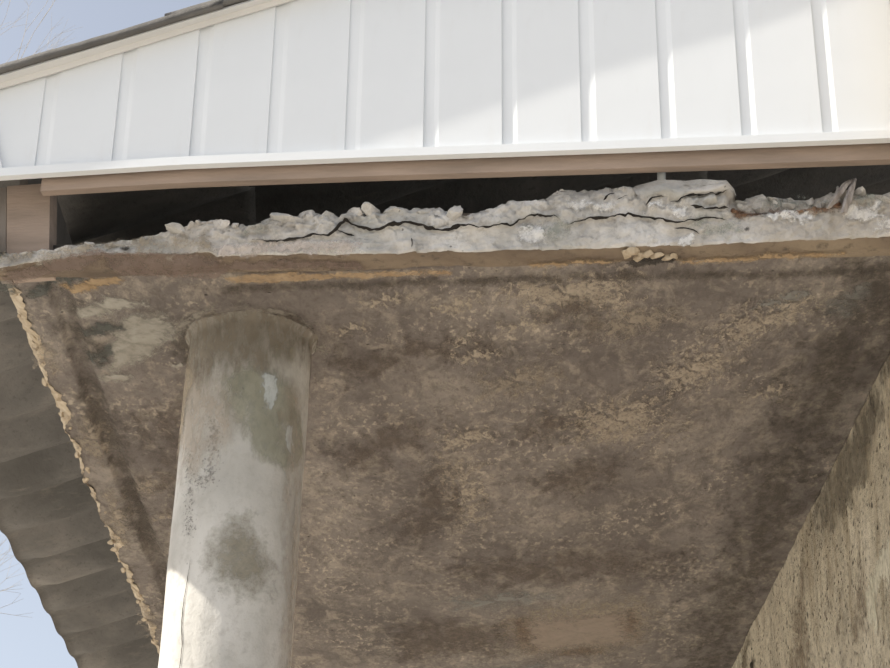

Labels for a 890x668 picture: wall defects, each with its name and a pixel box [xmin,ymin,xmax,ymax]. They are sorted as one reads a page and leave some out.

spalling [144,222,185,239]
spalling [261,202,401,224]
spalling [446,205,463,221]
crack [257,190,732,247]
peeling [634,179,841,230]
damp [70,300,126,367]
damp [156,310,318,461]
spalling [8,284,176,654]
damp [76,378,167,575]
damp [680,259,890,668]
damp [217,523,267,587]
crack [179,558,191,668]